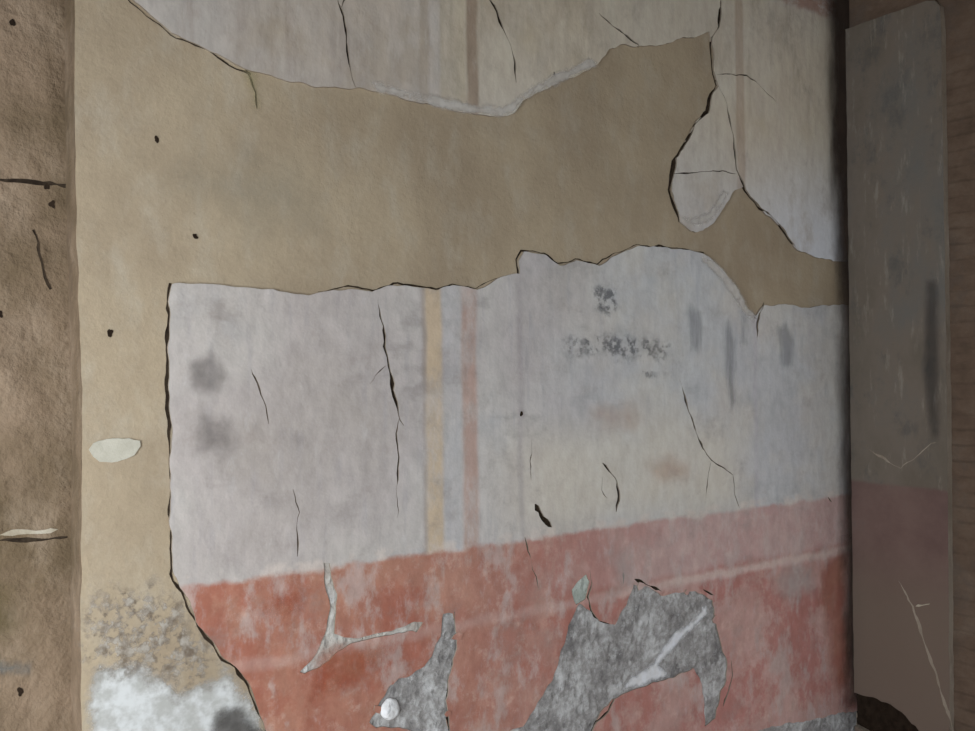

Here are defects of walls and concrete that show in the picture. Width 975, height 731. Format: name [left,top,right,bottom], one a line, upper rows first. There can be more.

crack [0,179,66,188]
crack [338,0,350,67]
peeling [427,59,595,115]
crack [668,8,792,244]
crack [324,244,704,480]
leakage [89,593,260,731]
spalling [300,563,422,673]
spalling [369,613,463,731]
spalling [511,575,727,731]